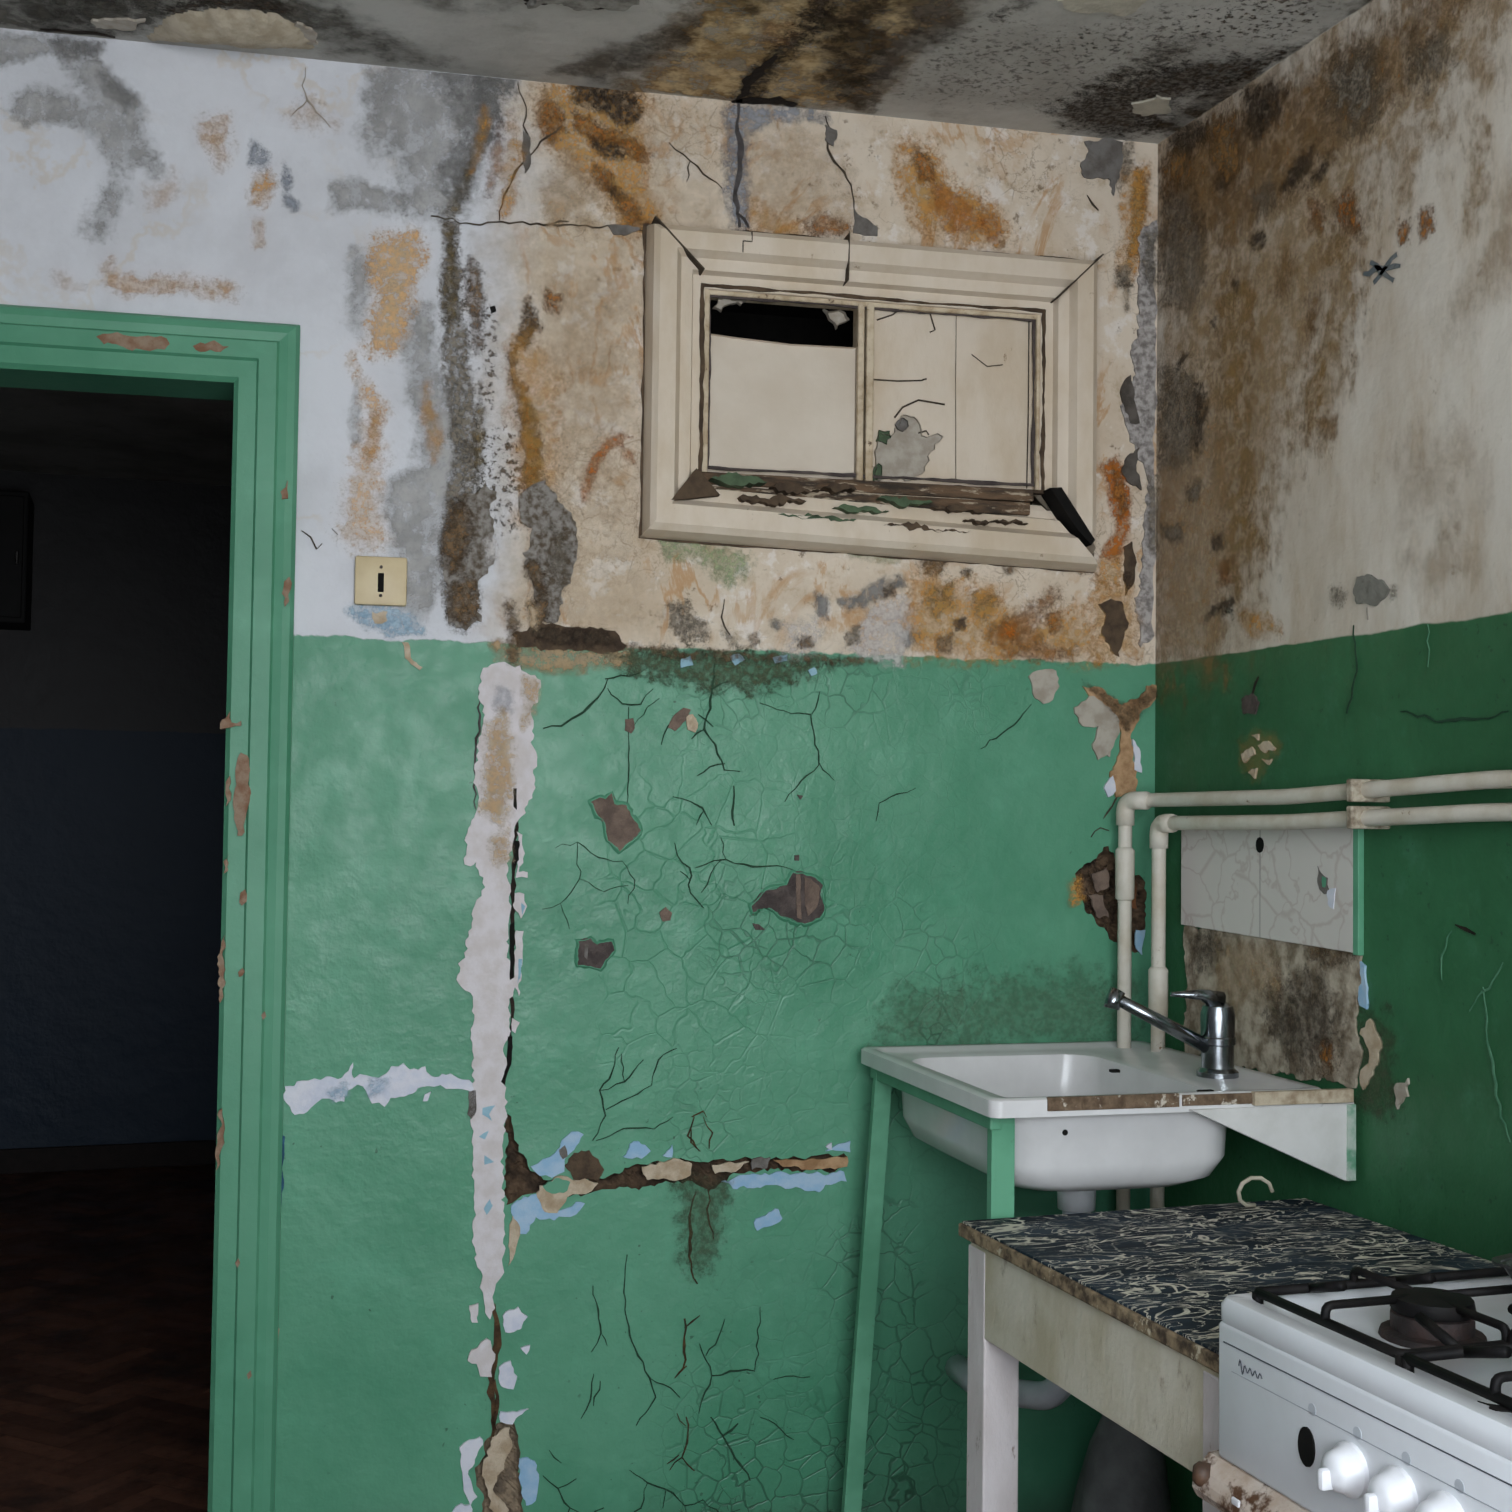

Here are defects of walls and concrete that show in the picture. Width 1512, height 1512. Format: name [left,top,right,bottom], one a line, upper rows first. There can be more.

water stain [0,0,170,167]
crack [669,55,878,286]
water stain [1044,0,1334,162]
water stain [245,0,578,632]
peeling [708,414,1028,533]
water stain [1331,574,1396,620]
crack [543,662,793,908]
peeling [1071,684,1158,955]
crack [501,788,635,1085]
peeling [283,602,872,1389]
crack [486,1304,502,1437]
flaking render [452,1408,539,1512]